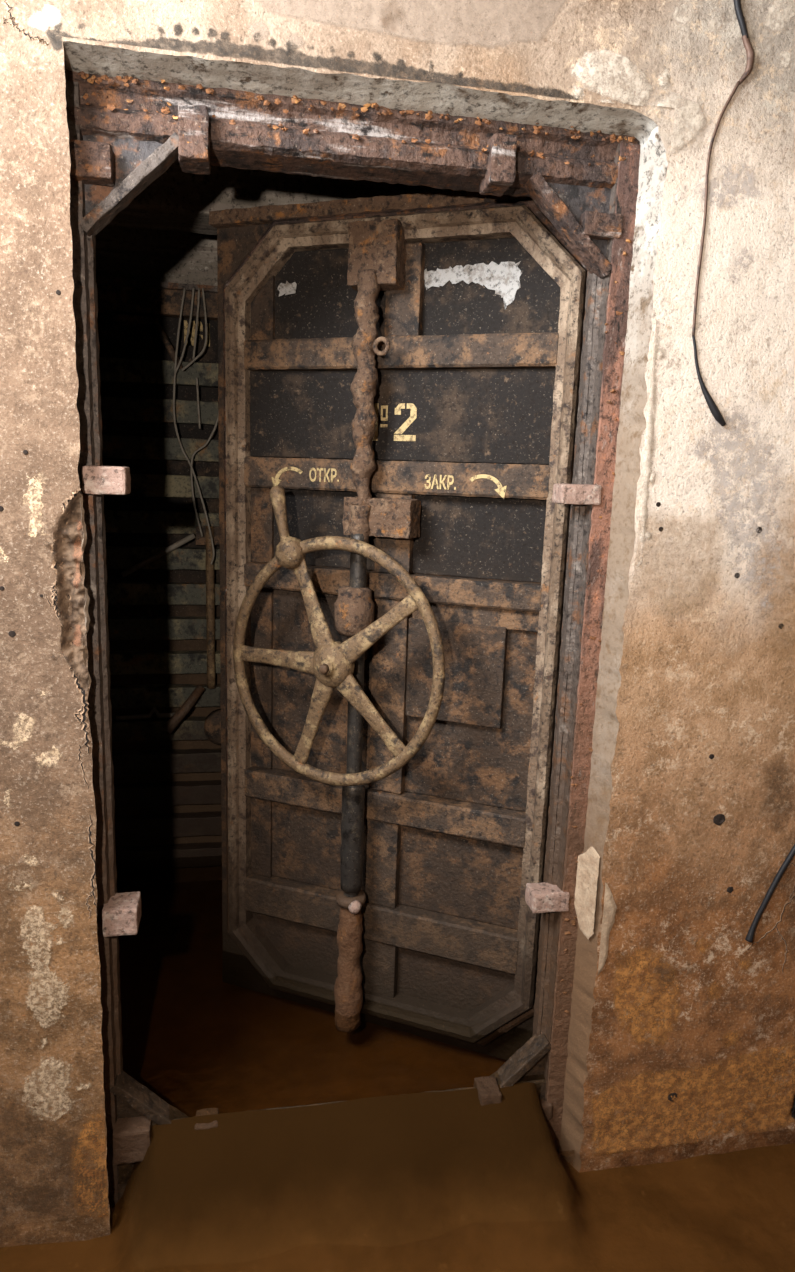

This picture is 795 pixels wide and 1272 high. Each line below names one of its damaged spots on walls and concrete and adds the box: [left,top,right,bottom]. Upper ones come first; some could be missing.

spalling [40,488,88,691]
water stain [0,712,62,767]
water stain [0,892,105,1216]